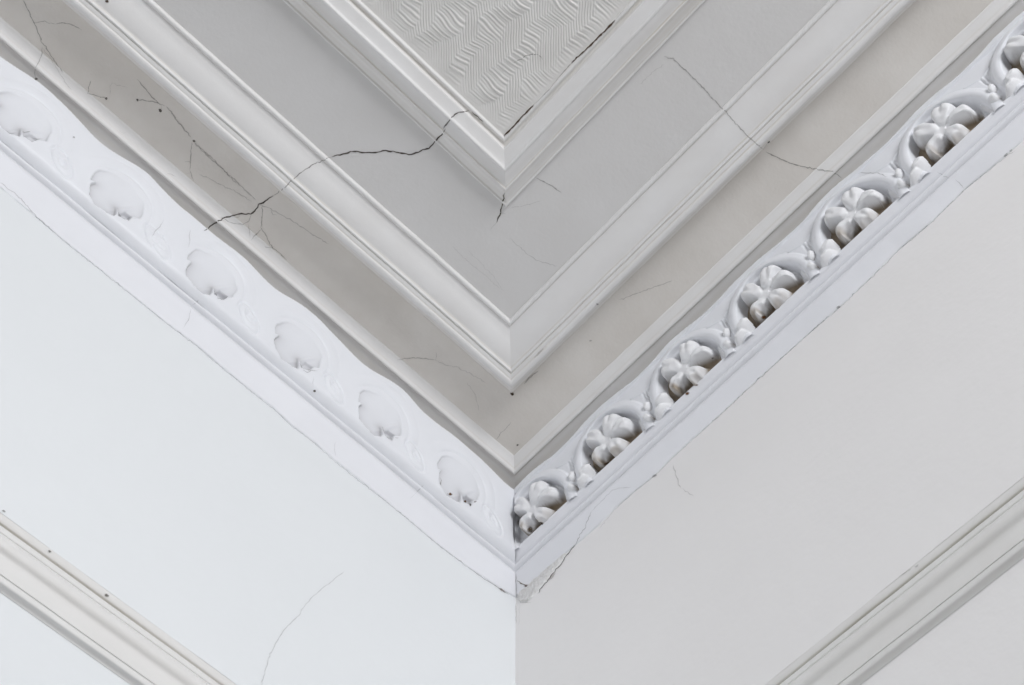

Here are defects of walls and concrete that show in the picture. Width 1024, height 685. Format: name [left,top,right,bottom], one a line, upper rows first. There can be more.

crack [572,21,615,62]
crack [504,106,533,136]
crack [206,111,482,230]